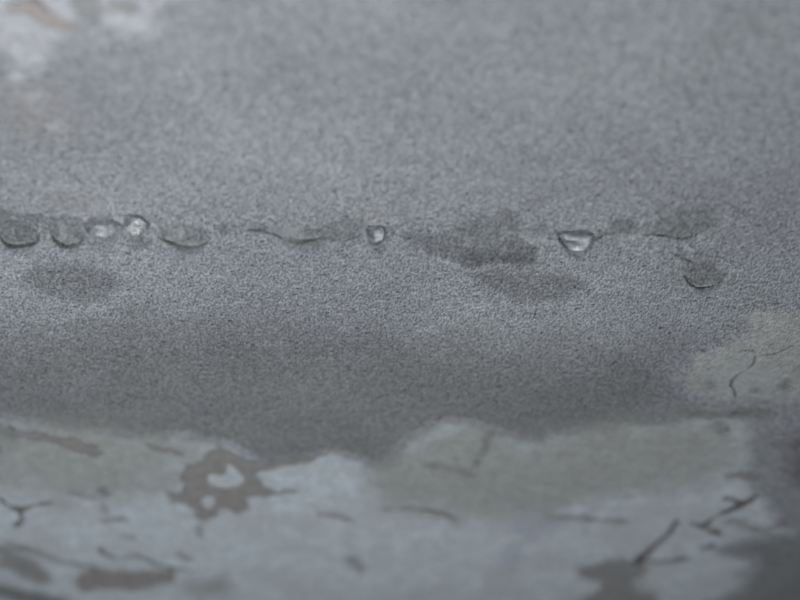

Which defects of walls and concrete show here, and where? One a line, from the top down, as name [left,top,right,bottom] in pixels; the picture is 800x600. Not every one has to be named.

damp [0,54,769,508]
peeling [9,429,102,457]
peeling [167,446,313,521]
spalling [762,417,800,508]
crack [0,500,56,560]
crack [632,495,783,564]
peeling [74,569,176,592]
peeling [579,559,653,600]